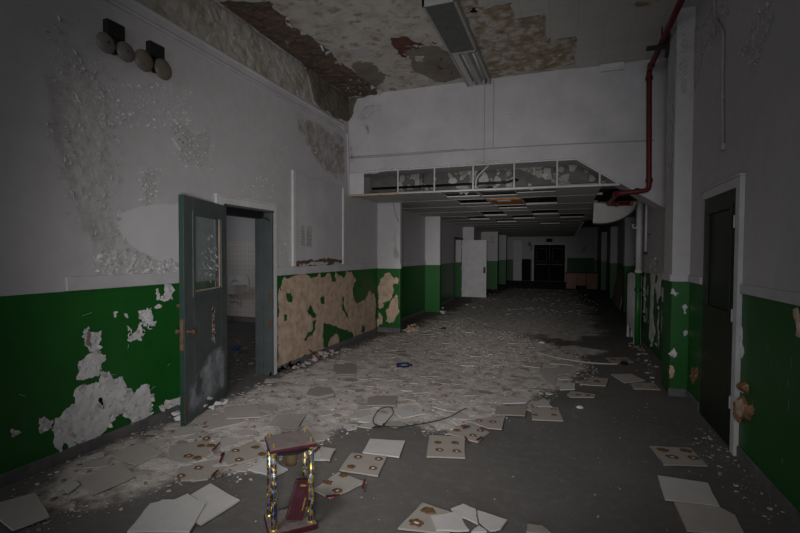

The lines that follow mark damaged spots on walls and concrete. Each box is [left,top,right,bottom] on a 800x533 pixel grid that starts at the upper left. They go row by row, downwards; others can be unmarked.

peeling [137,0,385,123]
flaking render [404,45,462,84]
peeling [459,0,577,78]
peeling [445,156,607,195]
peeling [113,284,175,342]
peeling [277,270,399,369]
peeling [643,269,678,349]
peeling [38,327,180,453]